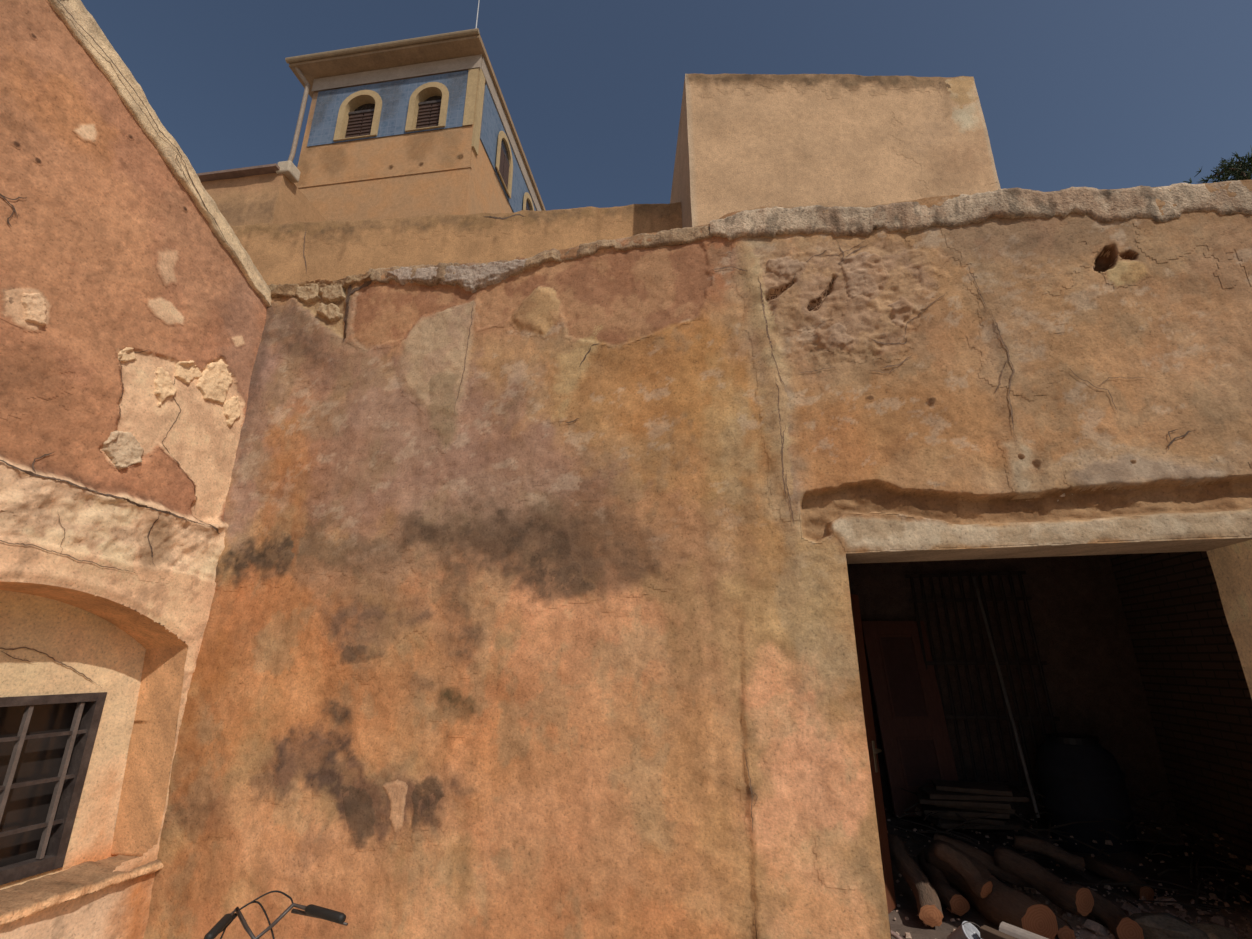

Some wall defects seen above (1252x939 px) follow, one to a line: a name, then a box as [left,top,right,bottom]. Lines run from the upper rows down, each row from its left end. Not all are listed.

crack [0,194,27,226]
spalling [0,279,53,333]
crack [0,452,219,573]
crack [57,0,244,267]
spalling [145,246,186,327]
spalling [99,334,246,529]
crack [715,241,867,524]
crack [869,270,1015,435]
peeling [1104,248,1151,289]
crack [0,647,101,687]
damp [215,475,679,737]
damp [162,689,487,898]